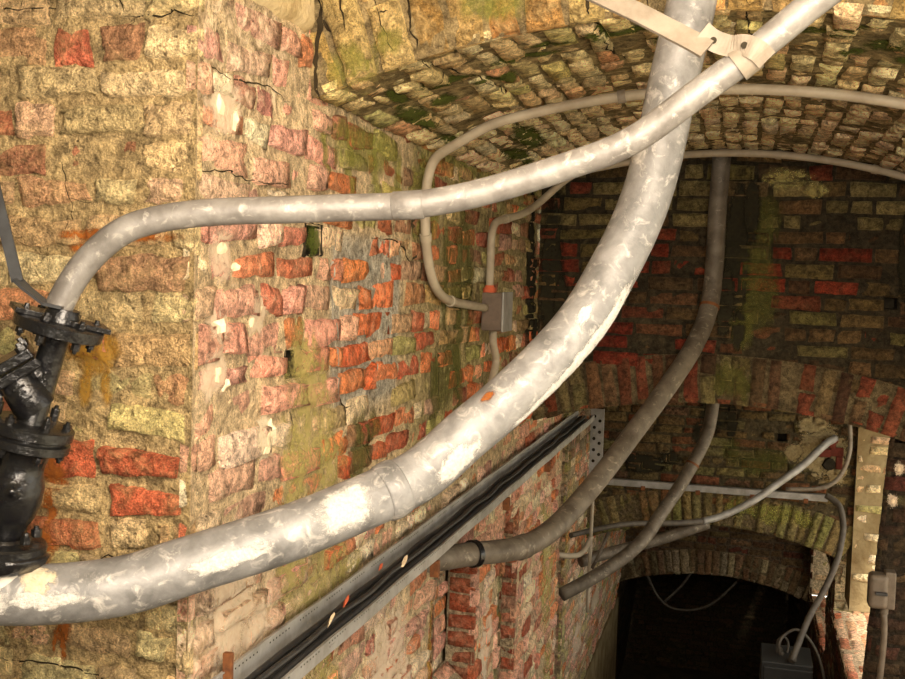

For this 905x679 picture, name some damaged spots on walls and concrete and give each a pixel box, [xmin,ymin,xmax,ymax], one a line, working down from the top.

crack [4,0,71,11]
crack [119,0,194,41]
crack [313,0,345,99]
crack [202,60,289,102]
rust [69,335,118,406]
crack [3,658,103,679]